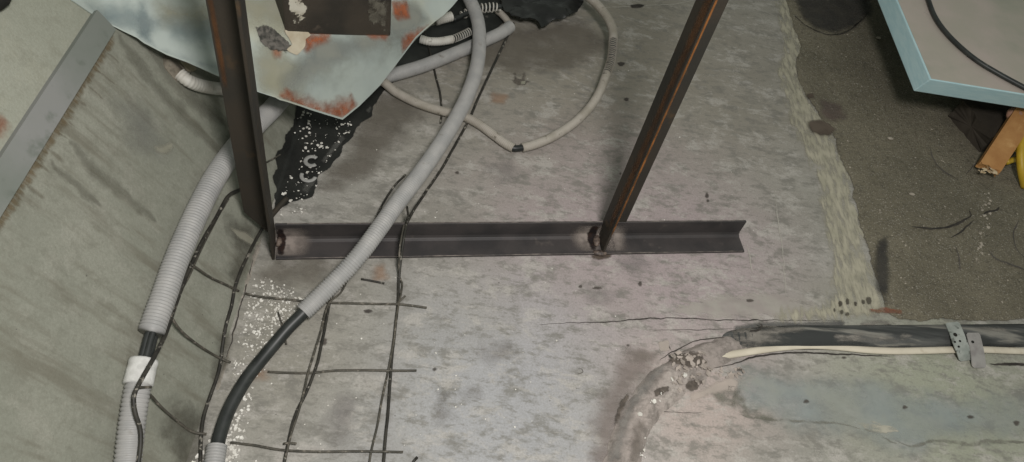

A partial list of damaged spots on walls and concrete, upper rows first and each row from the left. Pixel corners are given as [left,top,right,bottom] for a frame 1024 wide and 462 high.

rust [613,0,718,232]
crack [542,317,882,368]
spalling [650,350,745,404]